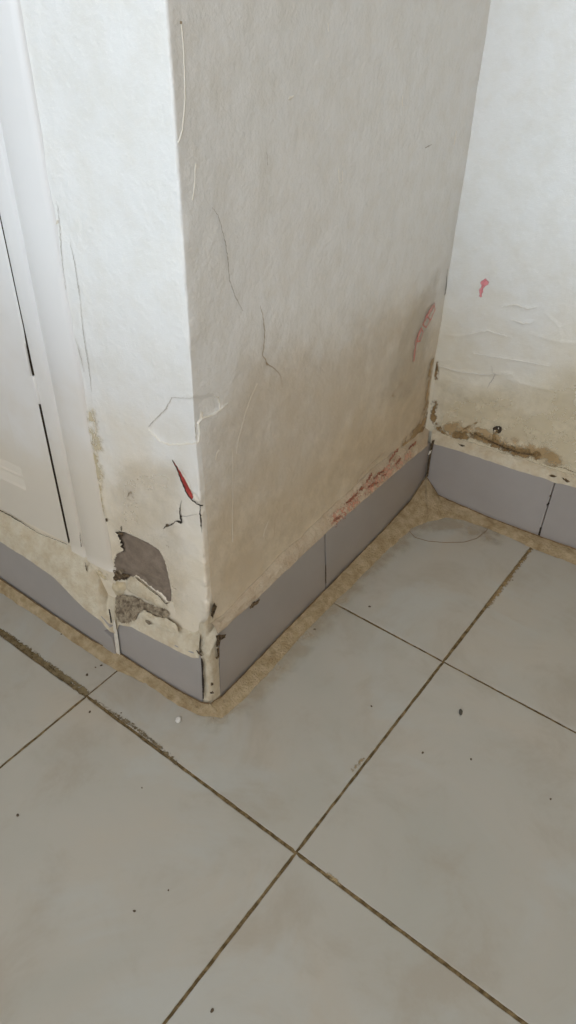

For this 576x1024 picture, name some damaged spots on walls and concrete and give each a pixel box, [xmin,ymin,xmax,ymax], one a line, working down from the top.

crack [215,211,283,387]
peeling [331,441,416,523]
spalling [112,526,179,634]